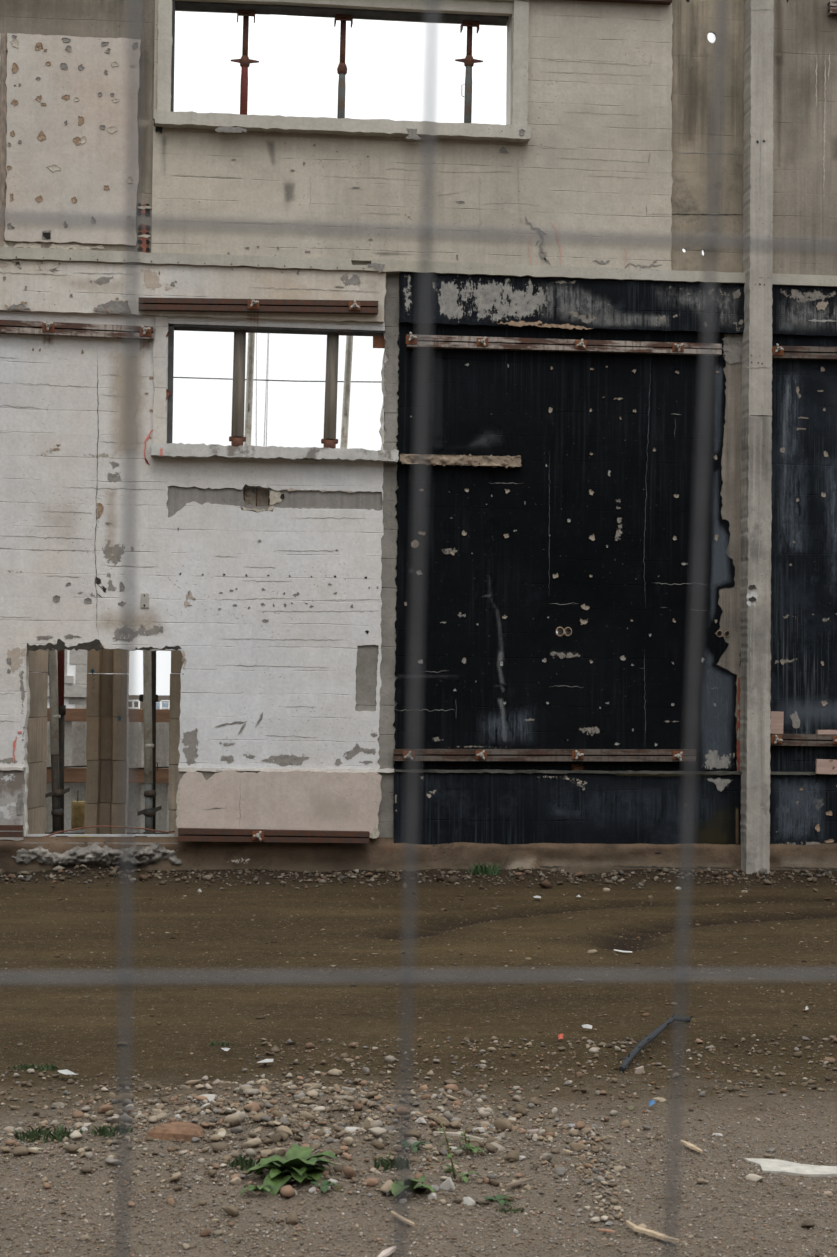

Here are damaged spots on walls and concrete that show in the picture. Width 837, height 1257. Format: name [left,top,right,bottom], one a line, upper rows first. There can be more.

crack [256,168,551,265]
peeling [403,275,412,315]
peeling [432,275,744,373]
crack [2,357,161,639]
spalling [6,625,182,741]
peeling [182,728,199,765]
peeling [219,742,309,767]
peeling [334,732,378,766]